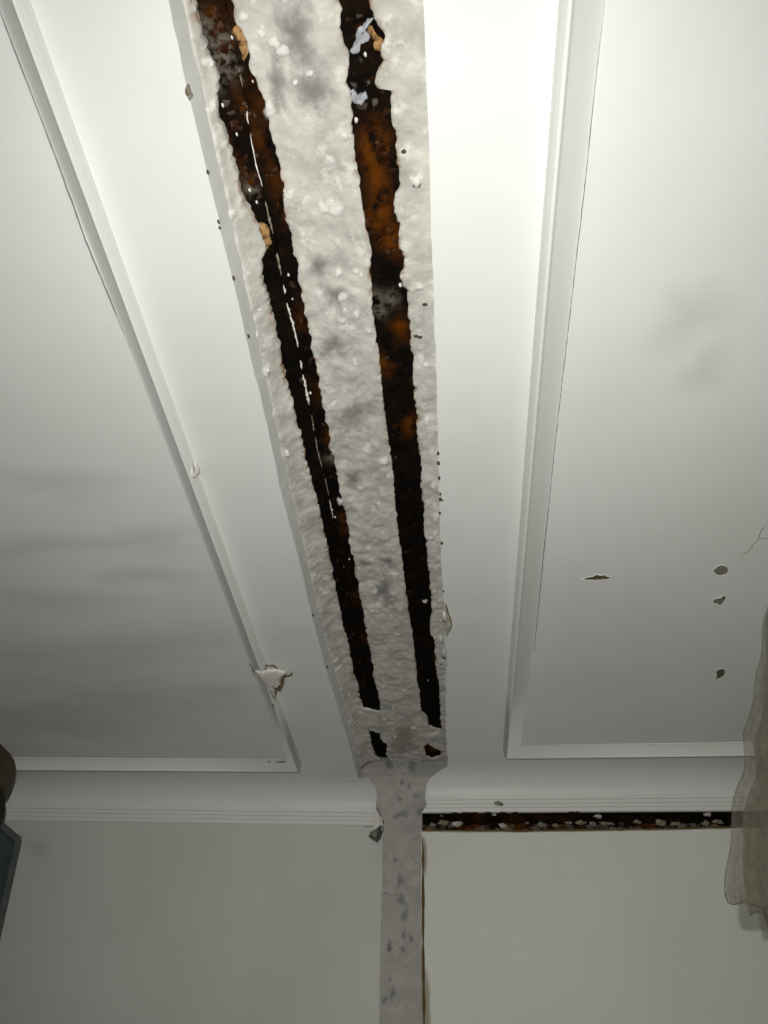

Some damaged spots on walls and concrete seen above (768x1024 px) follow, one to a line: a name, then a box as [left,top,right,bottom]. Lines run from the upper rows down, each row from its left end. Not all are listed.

corrosion [205,4,252,87]
corrosion [346,2,384,51]
corrosion [223,99,257,139]
corrosion [350,75,391,140]
corrosion [260,222,272,249]
spalling [183,0,452,1024]
peeling [713,565,729,576]